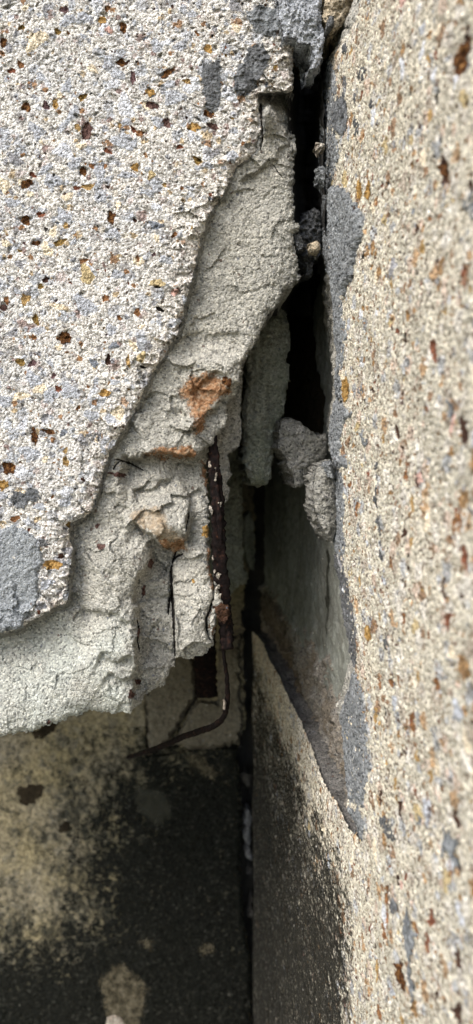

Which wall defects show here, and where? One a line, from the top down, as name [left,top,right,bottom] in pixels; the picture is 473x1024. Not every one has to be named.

crack [258,1,358,242]
spalling [330,0,360,55]
crack [267,272,312,316]
spalling [0,91,358,835]
crack [168,511,190,656]
rust [144,371,234,698]
crack [323,550,331,627]
leakage [0,643,353,1024]